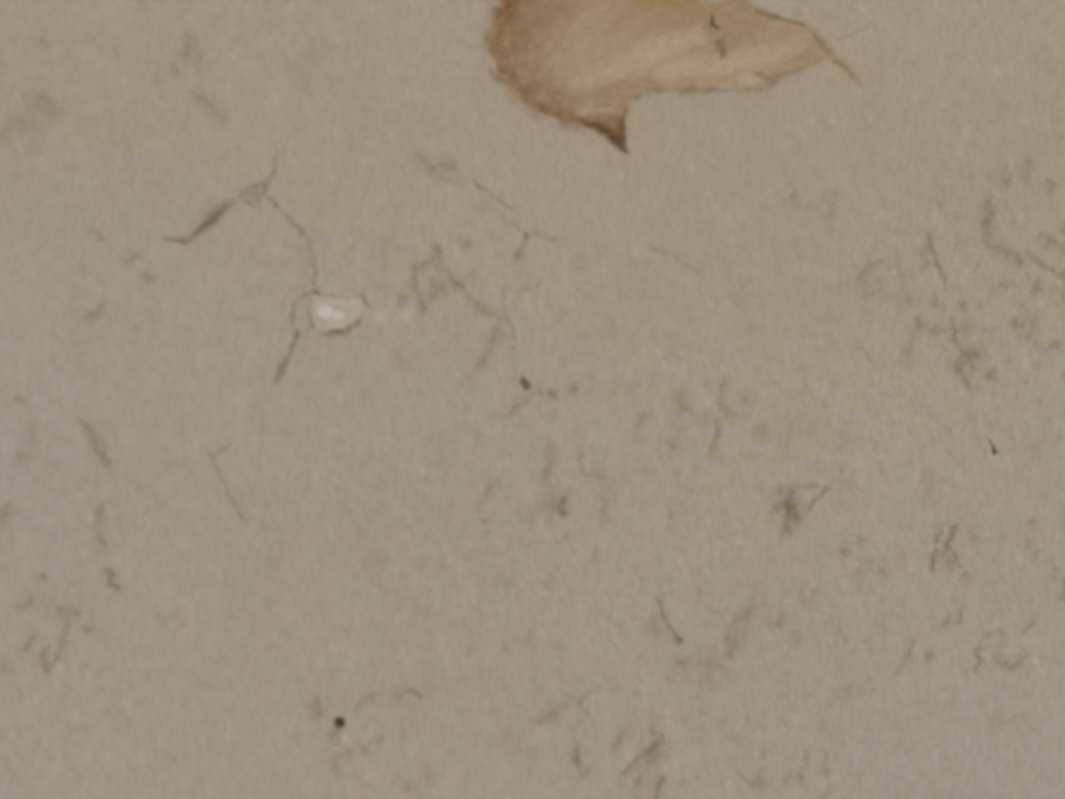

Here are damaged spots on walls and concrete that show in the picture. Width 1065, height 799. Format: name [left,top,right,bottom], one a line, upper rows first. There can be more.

spalling [477,0,864,157]
crack [161,149,320,294]
spalling [271,288,373,386]